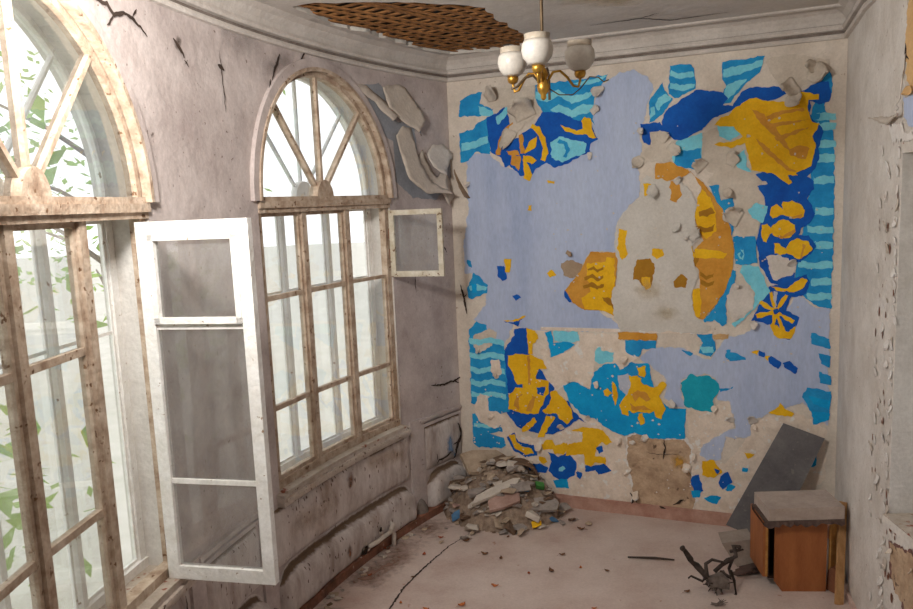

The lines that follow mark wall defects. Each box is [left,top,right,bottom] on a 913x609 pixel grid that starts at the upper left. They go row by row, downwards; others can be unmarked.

crack [97,0,147,36]
spalling [299,2,524,52]
peeling [764,54,831,107]
peeling [357,69,830,513]
peeling [868,0,913,609]
crack [437,423,462,464]
crack [389,538,461,609]